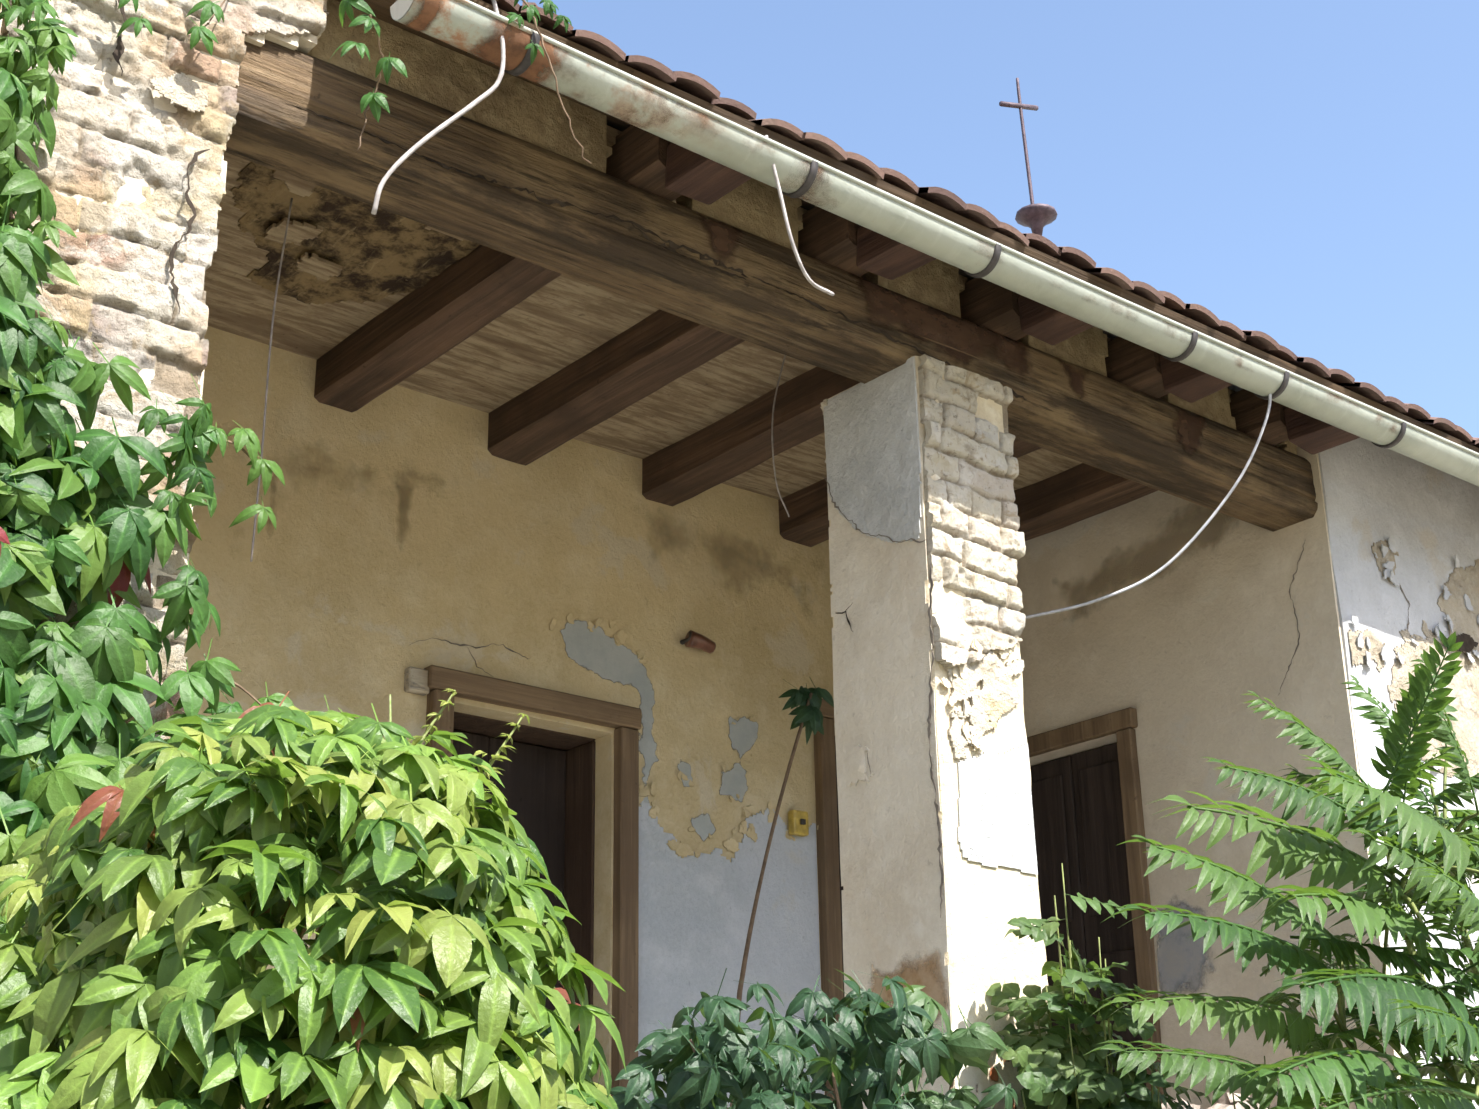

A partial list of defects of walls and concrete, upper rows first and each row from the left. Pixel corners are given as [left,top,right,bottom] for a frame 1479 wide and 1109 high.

crack [112,0,127,76]
rust [401,0,442,32]
rust [467,19,561,85]
crack [169,149,210,313]
peeling [264,217,343,282]
flaking render [2,0,329,740]
crack [410,638,528,676]
flaking render [918,354,1026,759]
crack [1278,542,1305,695]
spalling [1371,537,1400,586]
spalling [1348,556,1479,777]
peeling [549,613,822,1057]